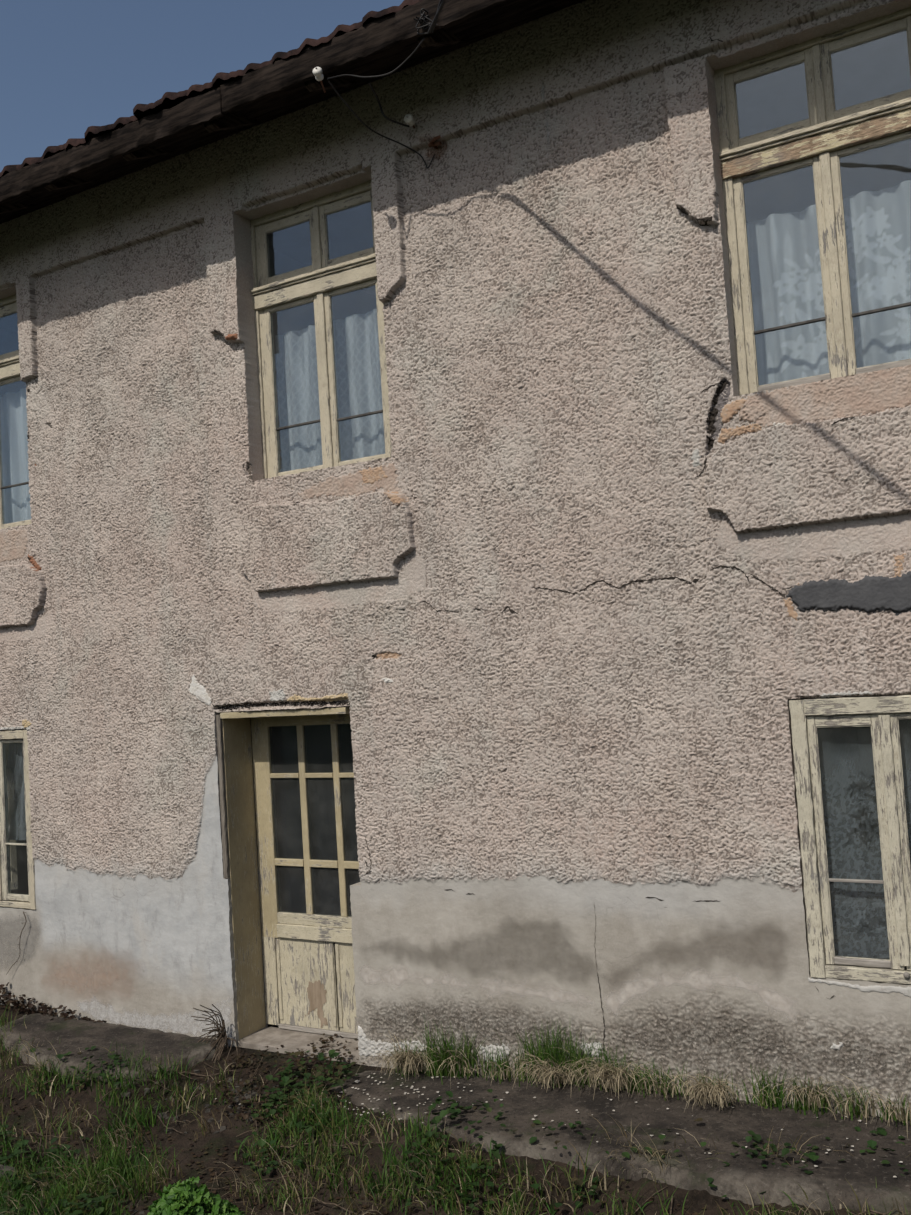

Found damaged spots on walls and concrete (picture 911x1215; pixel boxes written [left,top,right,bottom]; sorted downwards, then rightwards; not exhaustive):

flaking render [691,365,911,478]
crack [533,565,792,607]
crack [393,601,518,614]
spalling [188,675,350,712]
flaking render [794,691,911,699]
crack [594,906,605,1053]
flaking render [808,977,911,997]
flaking render [357,1026,427,1056]
flaking render [479,1043,511,1063]
flaking render [581,1042,602,1057]